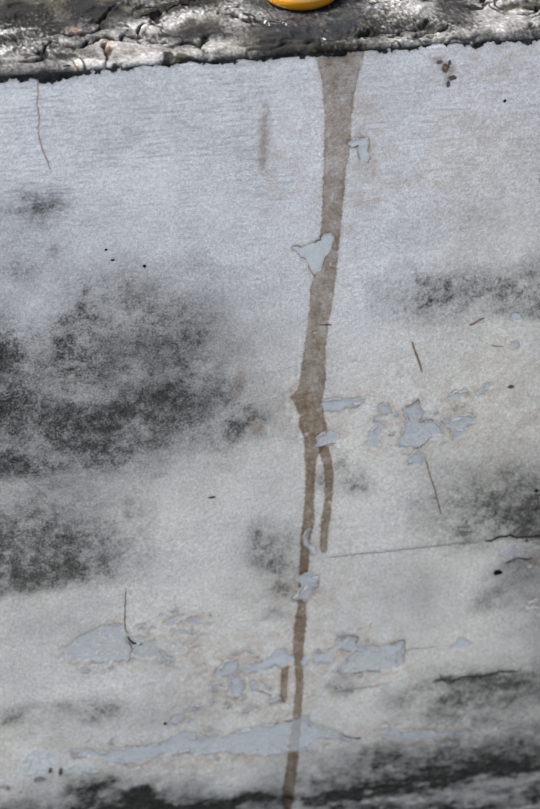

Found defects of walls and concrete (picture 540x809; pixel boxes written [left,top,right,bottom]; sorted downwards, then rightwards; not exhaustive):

peeling [291,231,335,277]
mould [415,278,540,318]
mould [0,289,227,477]
mould [225,407,262,440]
peeling [312,430,338,448]
peeling [367,383,492,465]
mould [0,500,120,595]
crack [328,534,540,564]
peeling [60,607,212,674]
peeling [163,625,406,726]
peeling [16,747,101,783]
damp [65,737,540,809]